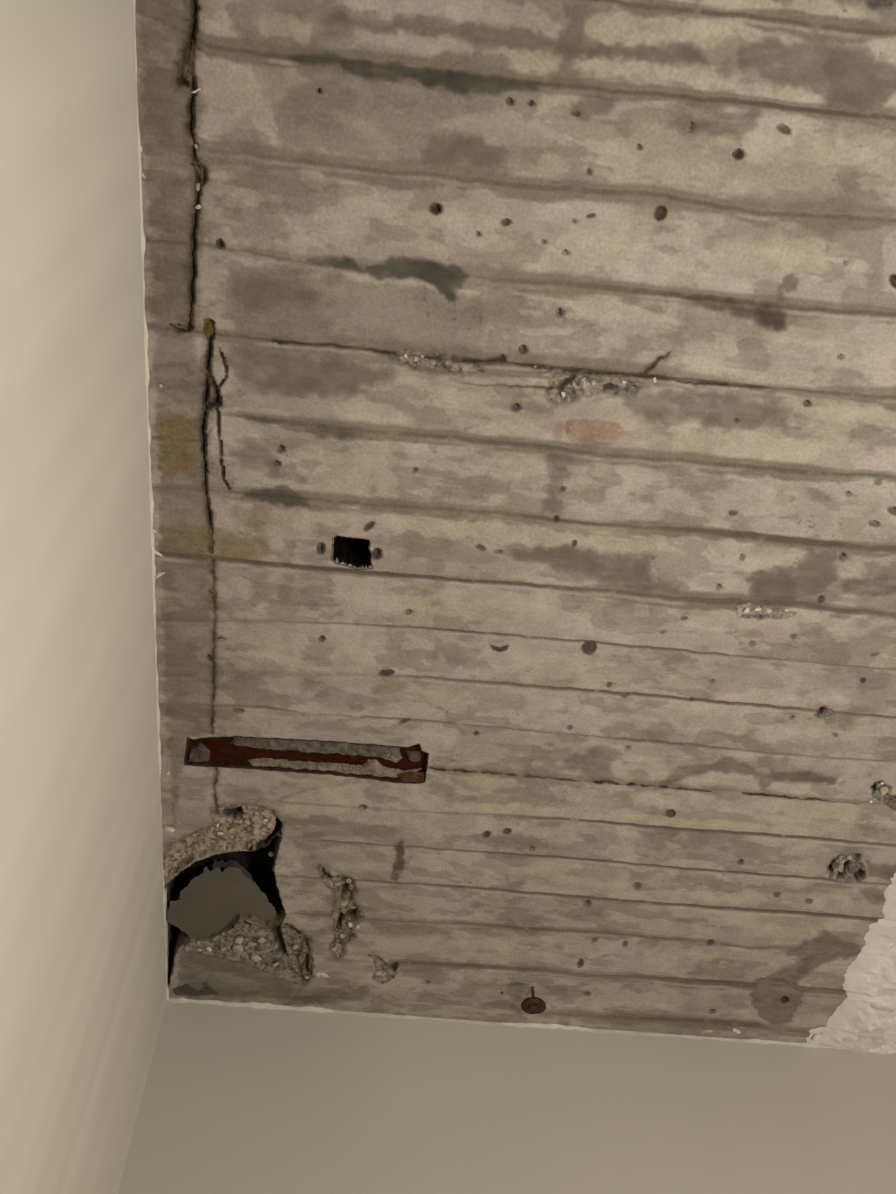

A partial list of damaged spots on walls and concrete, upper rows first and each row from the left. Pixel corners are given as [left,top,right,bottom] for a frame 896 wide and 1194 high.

leakage [331,259,467,301]
crack [170,0,230,736]
spalling [534,365,657,404]
spalling [736,603,796,620]
corrosion [184,736,429,784]
crack [213,768,223,819]
spalling [870,780,896,810]
spalling [827,853,866,883]
spalling [163,804,329,986]
spalling [318,865,364,959]
leakage [751,935,859,1024]
peeling [806,873,896,1054]